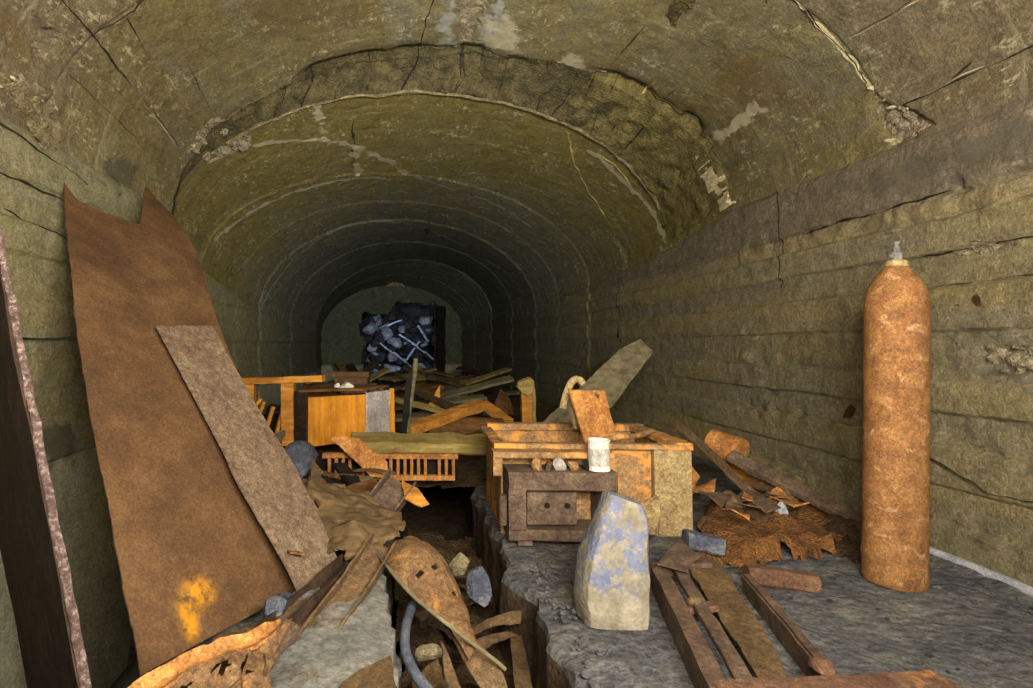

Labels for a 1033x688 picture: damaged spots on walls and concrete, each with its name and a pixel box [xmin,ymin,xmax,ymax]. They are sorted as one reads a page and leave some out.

crack [62,0,179,147]
damp [437,1,458,45]
spalling [172,0,736,242]
damp [475,0,518,50]
crack [766,0,920,86]
spalling [865,82,932,146]
crack [901,45,1033,125]
crack [0,122,88,185]
crack [0,172,64,201]
spalling [973,343,1033,381]
crack [930,457,1033,503]